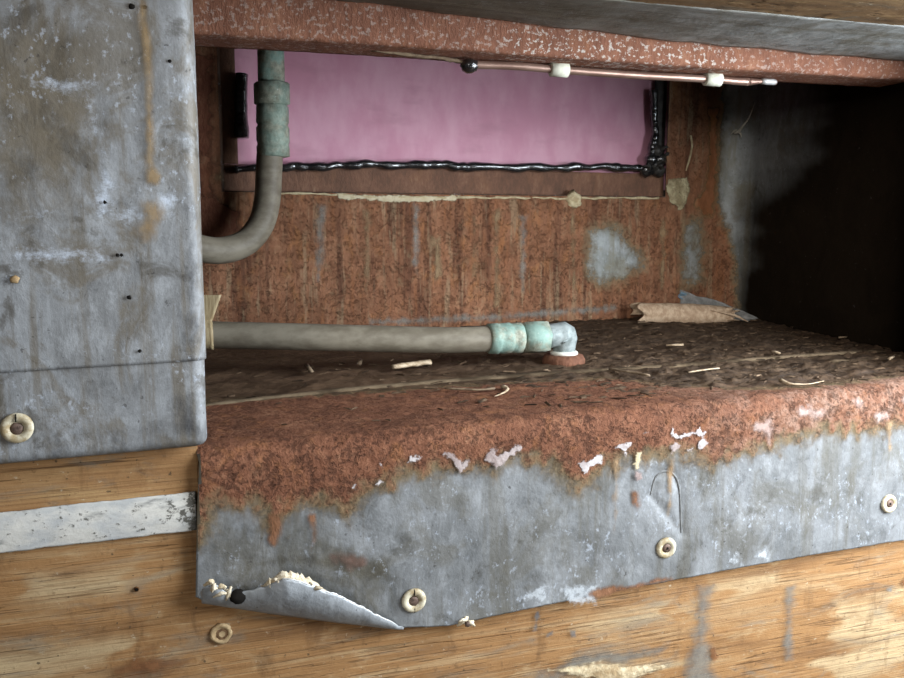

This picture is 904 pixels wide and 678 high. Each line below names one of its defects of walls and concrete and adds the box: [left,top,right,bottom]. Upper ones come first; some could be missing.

corrosion [129,3,151,96]
corrosion [195,46,255,237]
corrosion [203,81,739,327]
peeling [443,452,469,473]
peeling [484,445,522,468]
corrosion [197,376,904,549]
peeling [578,454,603,474]
peeling [617,442,642,481]
peeling [671,427,708,454]